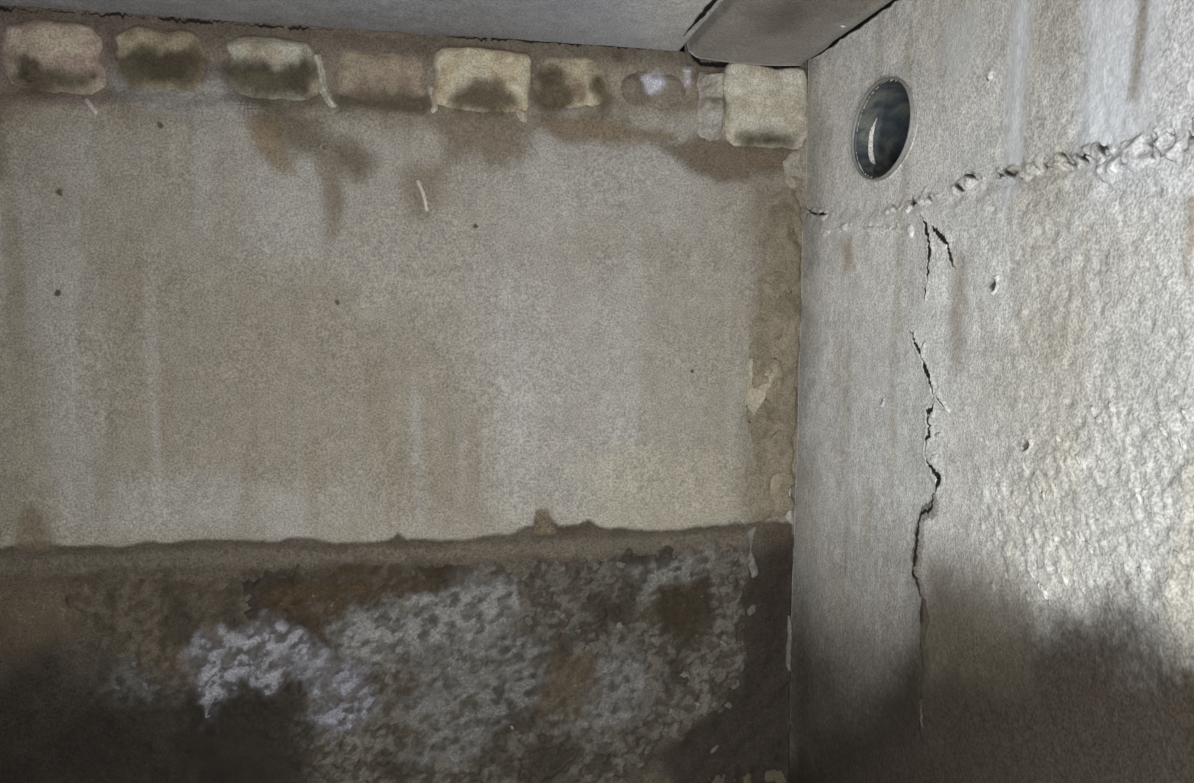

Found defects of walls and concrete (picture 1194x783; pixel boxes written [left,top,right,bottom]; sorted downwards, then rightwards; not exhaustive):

leakage [547,118,801,181]
crack [920,211,958,302]
leakage [0,510,1194,783]
crack [910,329,950,740]